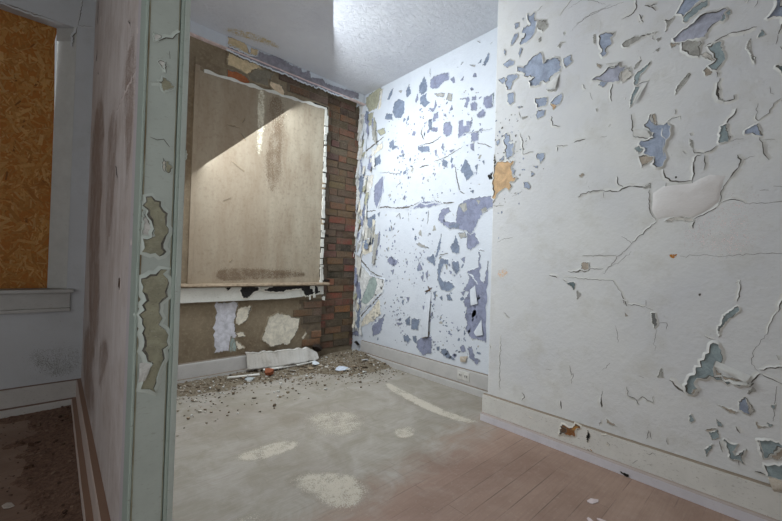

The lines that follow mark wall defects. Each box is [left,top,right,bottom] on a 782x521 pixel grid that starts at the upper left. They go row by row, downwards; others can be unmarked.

water stain [28,24,138,424]
water stain [261,95,287,194]
flaking render [211,11,574,366]
crack [537,0,659,25]
crack [549,132,719,338]
crack [624,98,651,141]
peeling [633,108,681,170]
peeling [590,0,732,109]
crack [712,70,739,105]
crack [716,154,782,208]
peeling [130,192,173,396]
peeling [657,305,782,492]